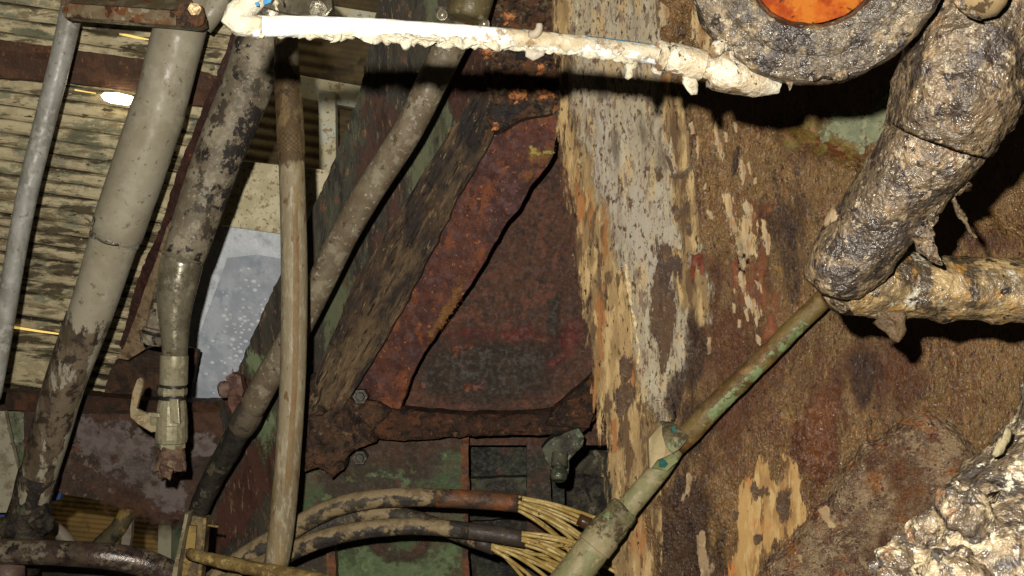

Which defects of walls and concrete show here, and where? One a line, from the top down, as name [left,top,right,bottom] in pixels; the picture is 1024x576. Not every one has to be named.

peeling [552,0,670,45]
peeling [679,7,711,53]
corrosion [350,89,399,188]
corrosion [370,179,407,254]
corrosion [428,276,468,343]
peeling [553,55,809,503]
corrosion [314,436,470,490]
peeling [612,486,663,576]
spalling [696,452,837,576]